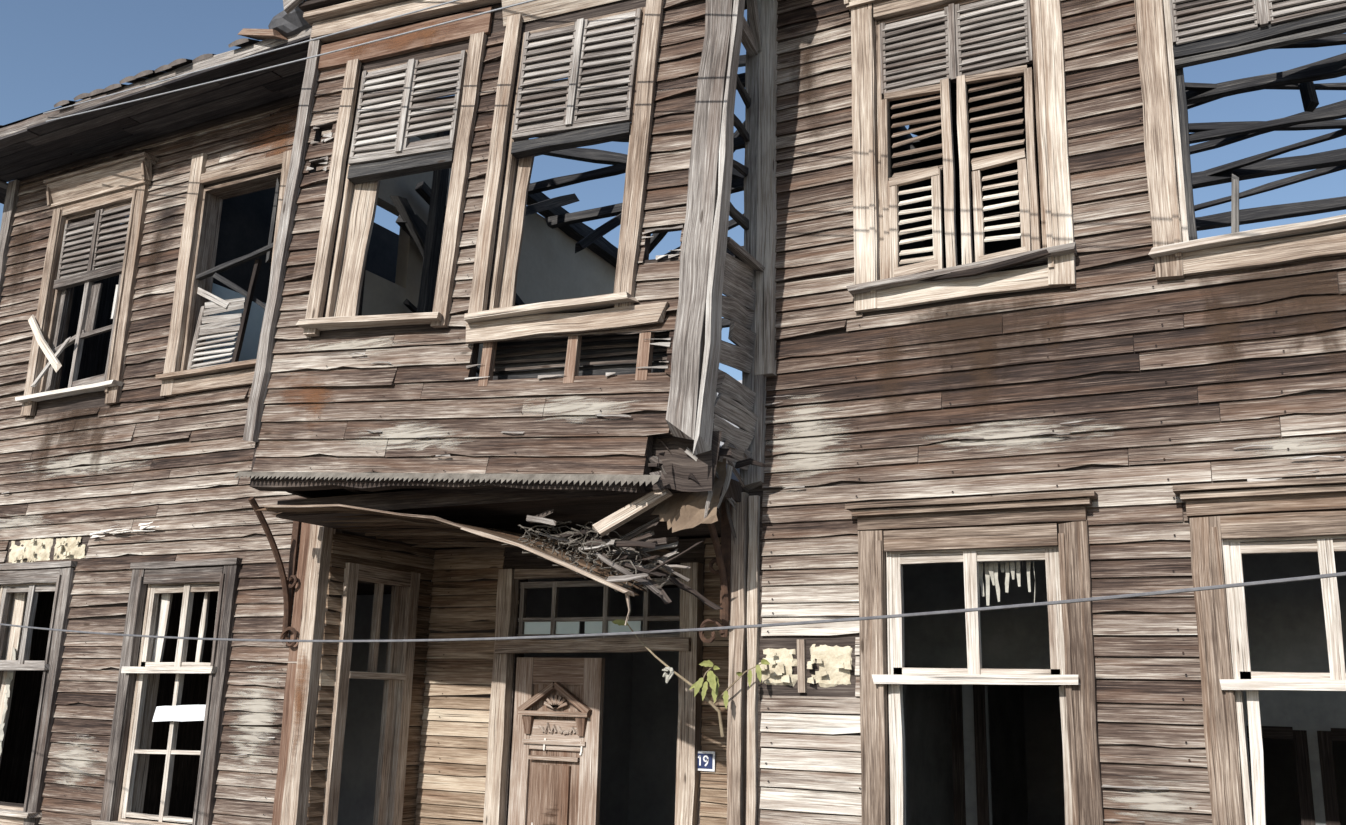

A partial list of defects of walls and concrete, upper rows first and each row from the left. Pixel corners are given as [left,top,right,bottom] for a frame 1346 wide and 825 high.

flaking render [0,516,86,563]
flaking render [759,644,852,688]